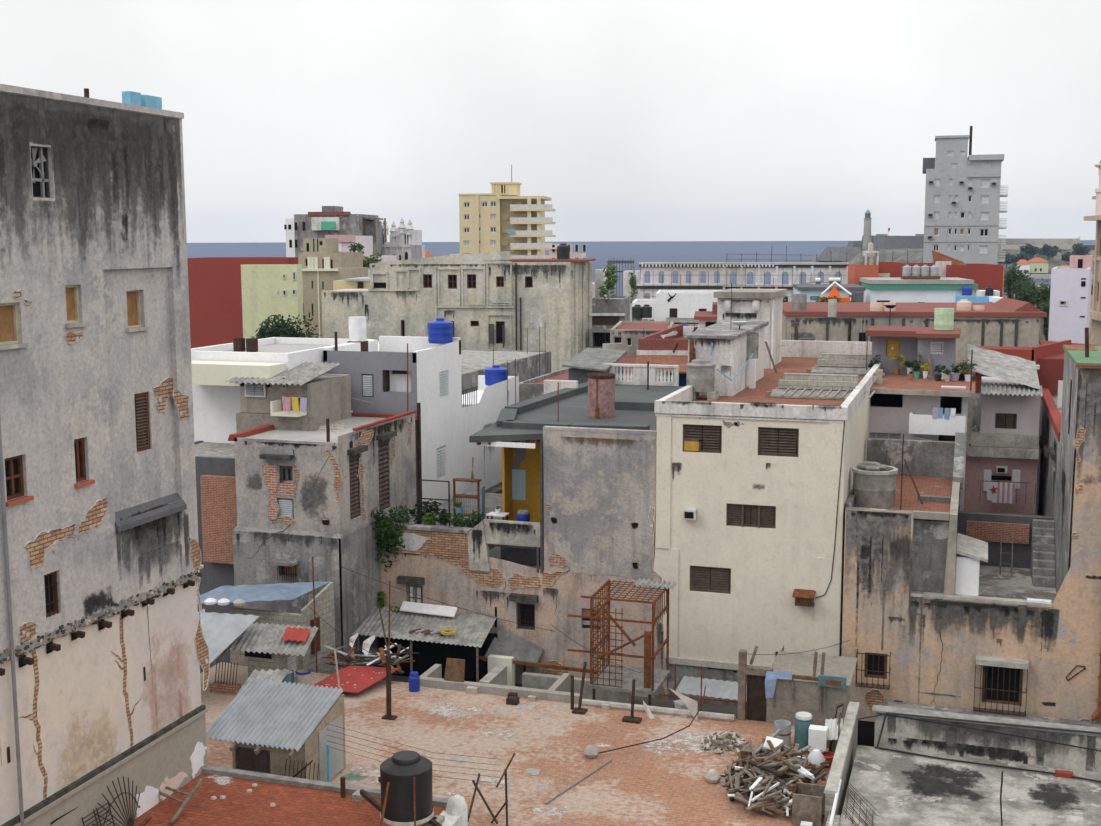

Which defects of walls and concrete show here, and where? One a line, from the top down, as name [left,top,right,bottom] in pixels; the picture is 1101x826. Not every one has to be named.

leakage [0,92,182,266]
spalling [153,377,190,420]
spalling [262,461,300,526]
leakage [301,477,327,517]
spalling [322,449,343,503]
spalling [351,429,374,523]
spalling [24,497,108,571]
peeling [393,532,431,551]
spalling [434,552,568,590]
leakage [845,510,1059,650]
leakage [887,716,1096,802]
leakage [1028,783,1078,809]